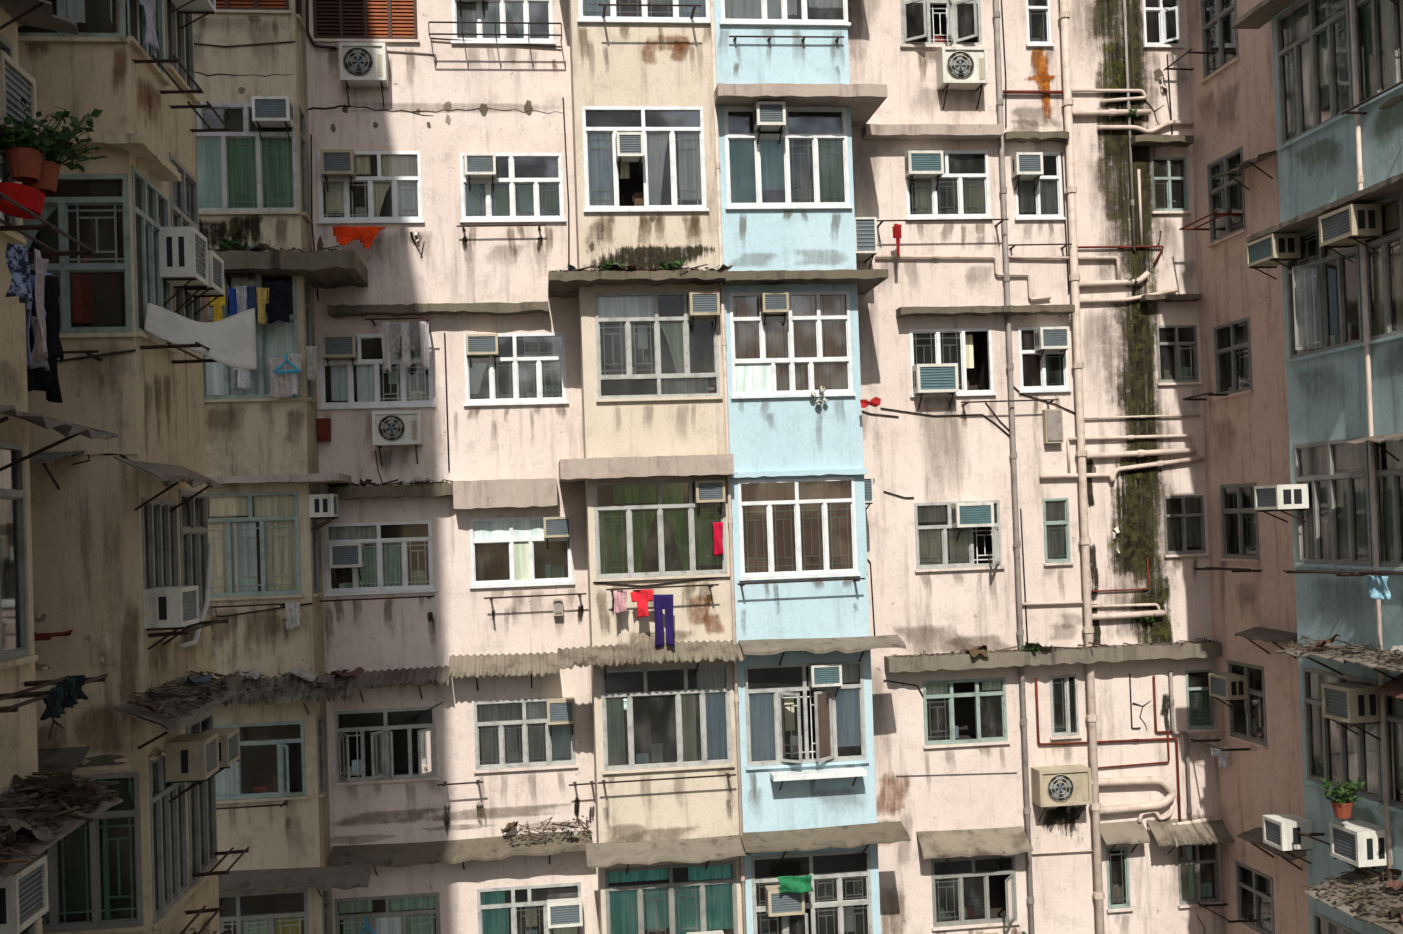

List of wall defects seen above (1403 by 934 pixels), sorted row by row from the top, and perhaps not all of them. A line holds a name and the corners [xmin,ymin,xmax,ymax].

rust [1027,48,1055,116]
water stain [590,244,715,271]
water stain [1089,0,1172,645]
water stain [1086,459,1094,508]
water stain [877,777,908,812]